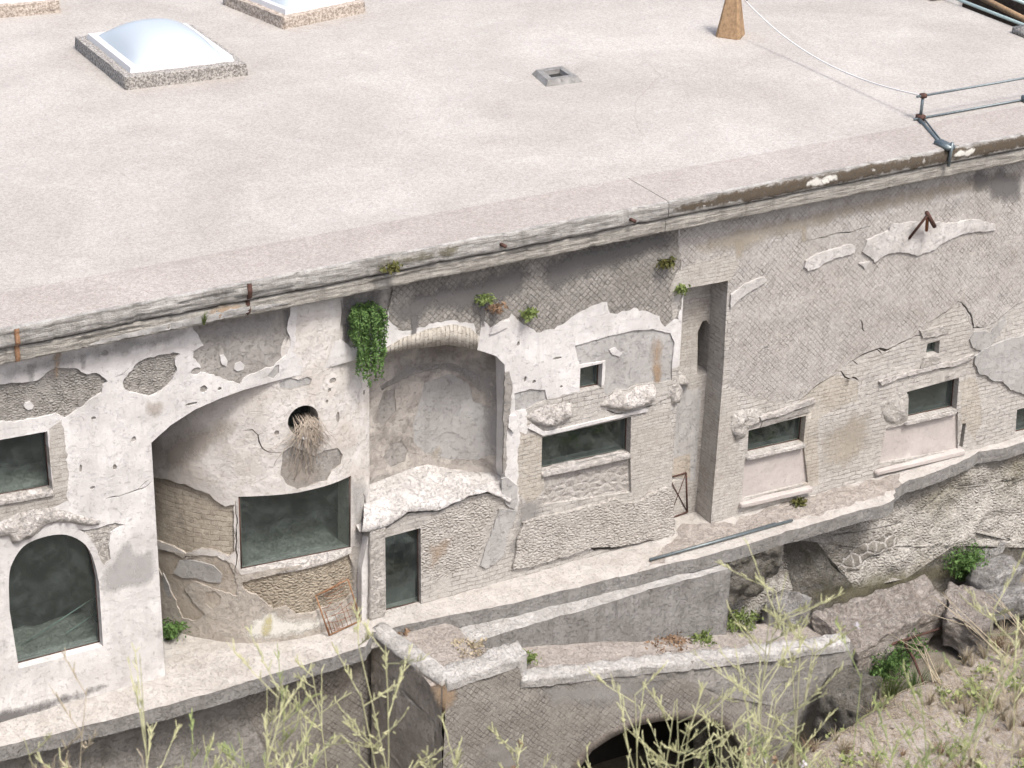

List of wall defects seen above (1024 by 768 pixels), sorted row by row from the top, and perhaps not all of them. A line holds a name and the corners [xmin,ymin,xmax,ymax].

peeling [803,219,996,271]
peeling [729,276,767,310]
spalling [90,303,311,406]
peeling [489,321,510,335]
crack [815,322,917,387]
peeling [879,334,1024,394]
spalling [0,368,106,421]
peeling [760,397,817,427]
spalling [153,477,353,620]